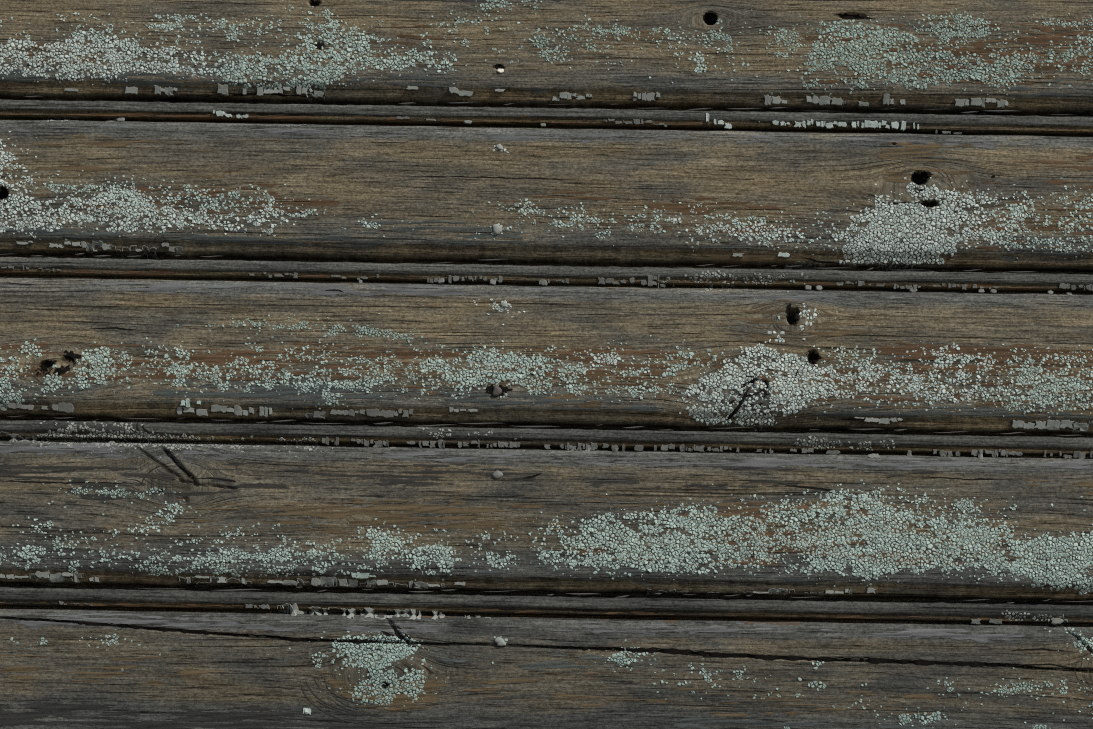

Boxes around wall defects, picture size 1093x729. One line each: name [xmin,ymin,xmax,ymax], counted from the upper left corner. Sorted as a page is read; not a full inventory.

peeling [0,0,1093,131]
peeling [474,177,1093,299]
peeling [427,275,503,285]
peeling [0,303,1093,459]
crack [8,423,236,492]
peeling [245,603,449,709]
peeling [594,639,781,700]
peeling [795,661,826,698]
peeling [848,683,957,726]
peeling [926,667,1093,719]